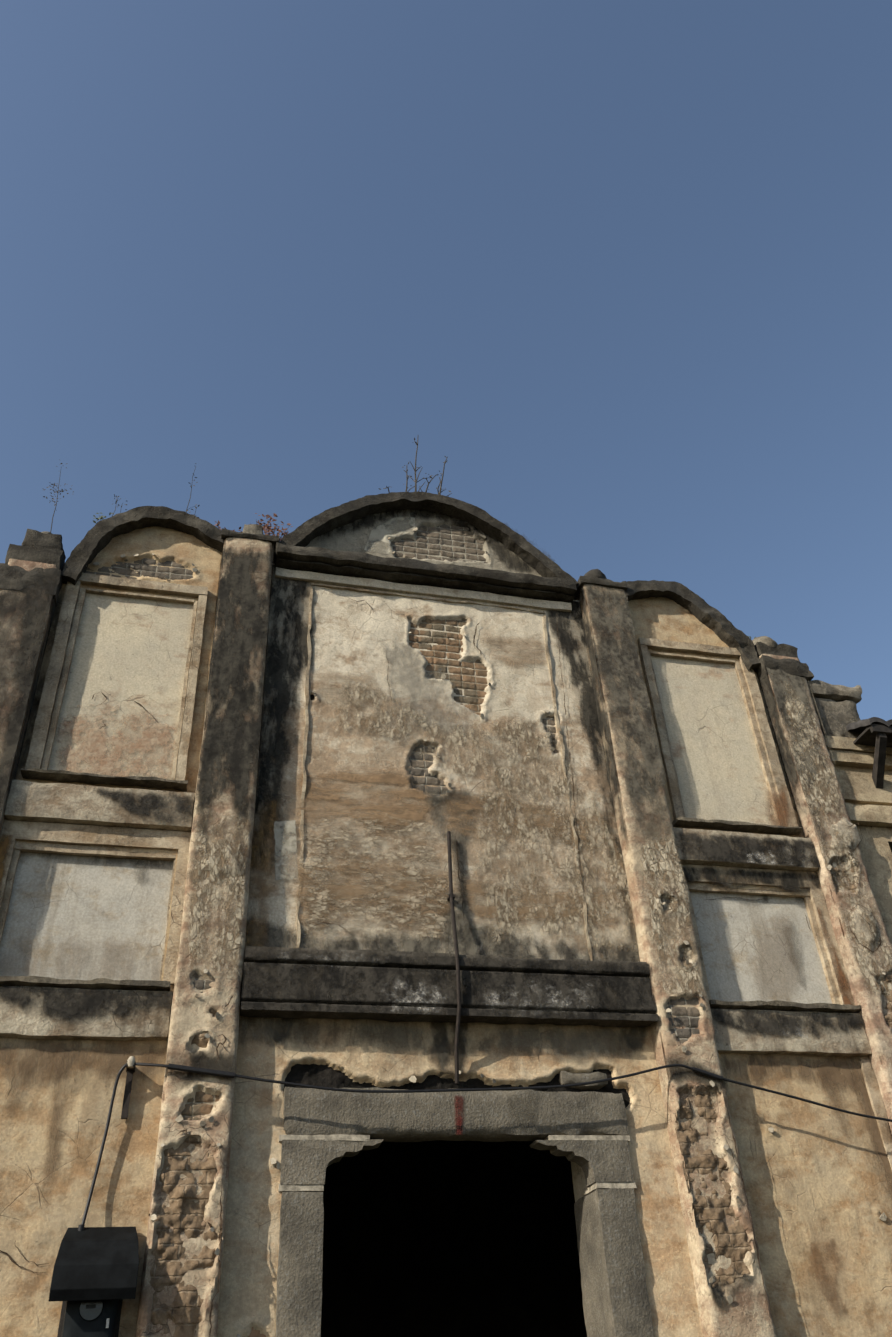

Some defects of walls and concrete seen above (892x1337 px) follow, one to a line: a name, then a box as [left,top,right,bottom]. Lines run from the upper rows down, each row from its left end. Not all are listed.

spalling [85,553,198,580]
spalling [388,524,488,563]
water stain [95,545,314,896]
water stain [239,584,829,1074]
crack [0,1241,49,1273]
spalling [149,1091,224,1337]
spalling [284,1063,630,1108]
spalling [675,1080,755,1304]